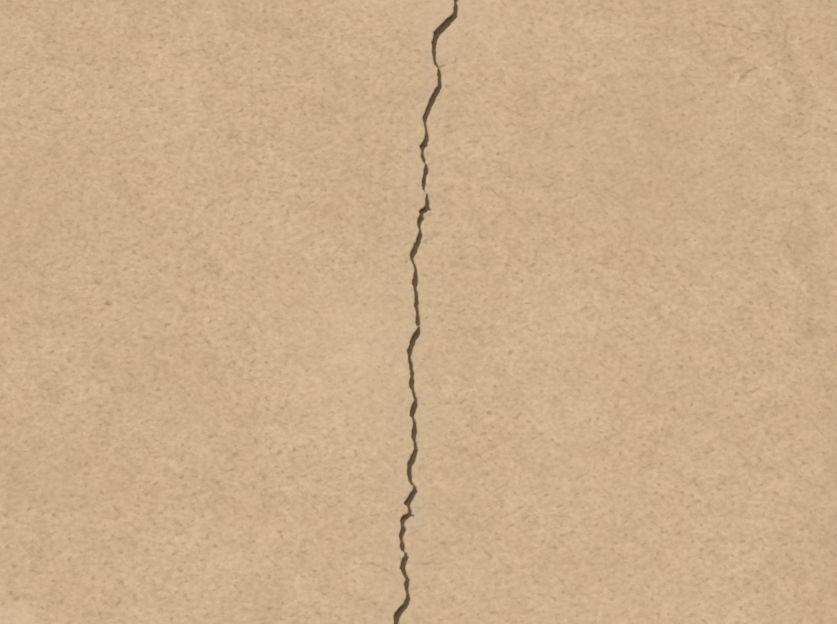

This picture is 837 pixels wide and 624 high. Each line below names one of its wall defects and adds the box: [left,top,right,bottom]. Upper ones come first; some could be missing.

crack [394,0,458,624]